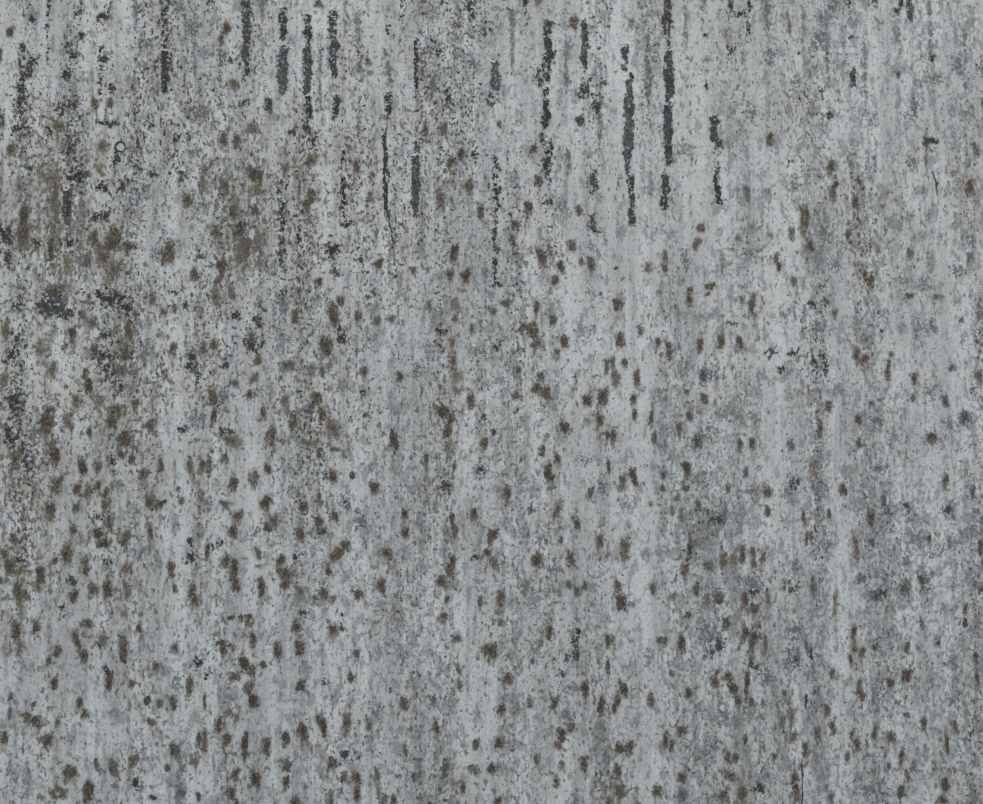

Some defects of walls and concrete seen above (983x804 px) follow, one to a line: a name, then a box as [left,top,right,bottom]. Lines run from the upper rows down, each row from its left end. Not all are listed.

leakage [173,0,201,74]
leakage [190,27,224,128]
leakage [317,34,325,103]
leakage [343,0,361,53]
leakage [508,9,516,75]
leakage [563,36,576,92]
leakage [644,34,658,106]
crack [383,113,394,252]